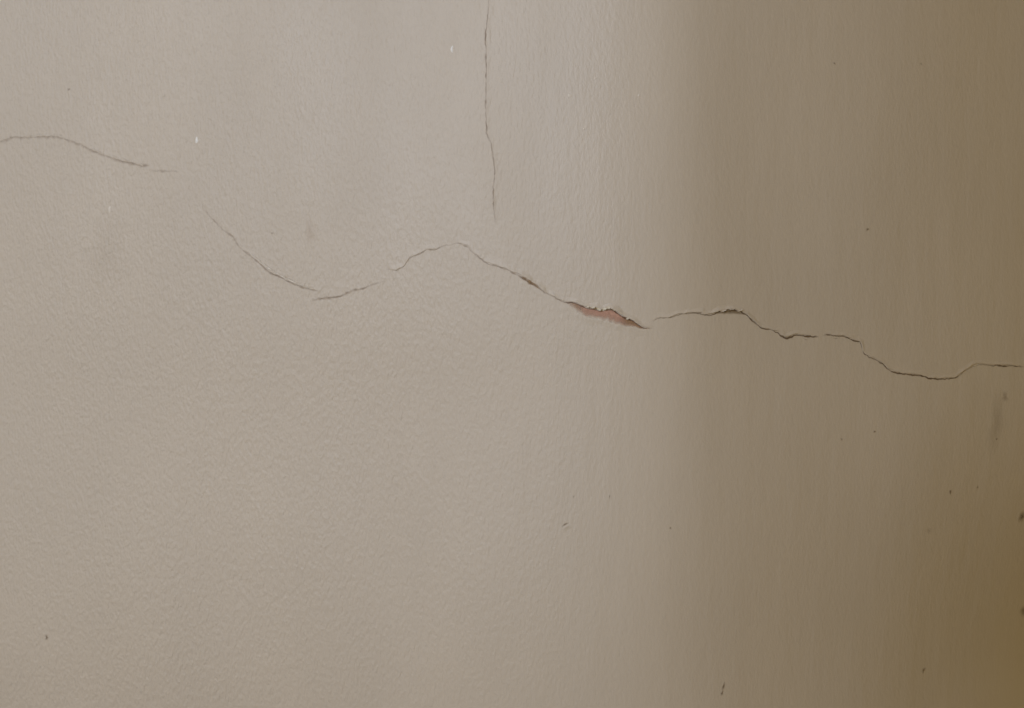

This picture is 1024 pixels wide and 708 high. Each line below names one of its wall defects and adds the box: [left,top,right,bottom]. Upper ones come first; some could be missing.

peeling [562,296,653,336]
crack [652,305,1021,380]